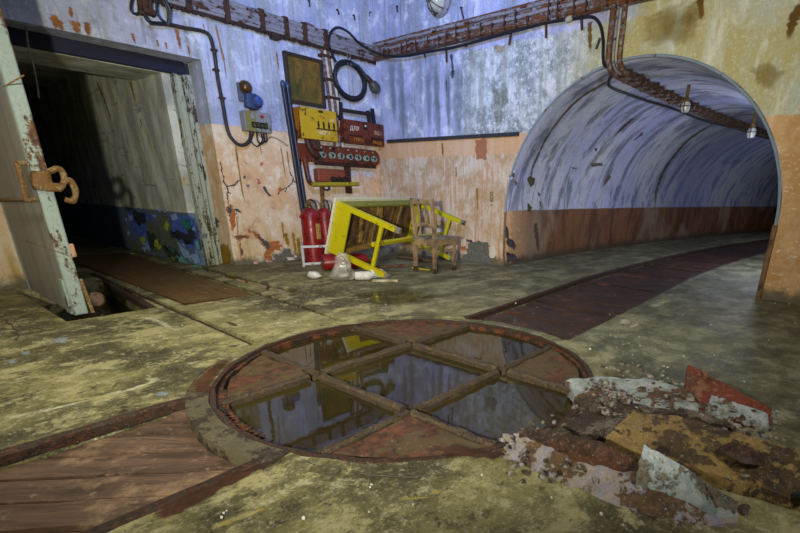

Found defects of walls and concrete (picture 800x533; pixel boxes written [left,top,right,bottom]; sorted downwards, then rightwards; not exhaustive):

corrosion [50,7,90,35]
crack [220,161,241,217]
peeling [215,204,300,265]
spalling [460,226,521,264]